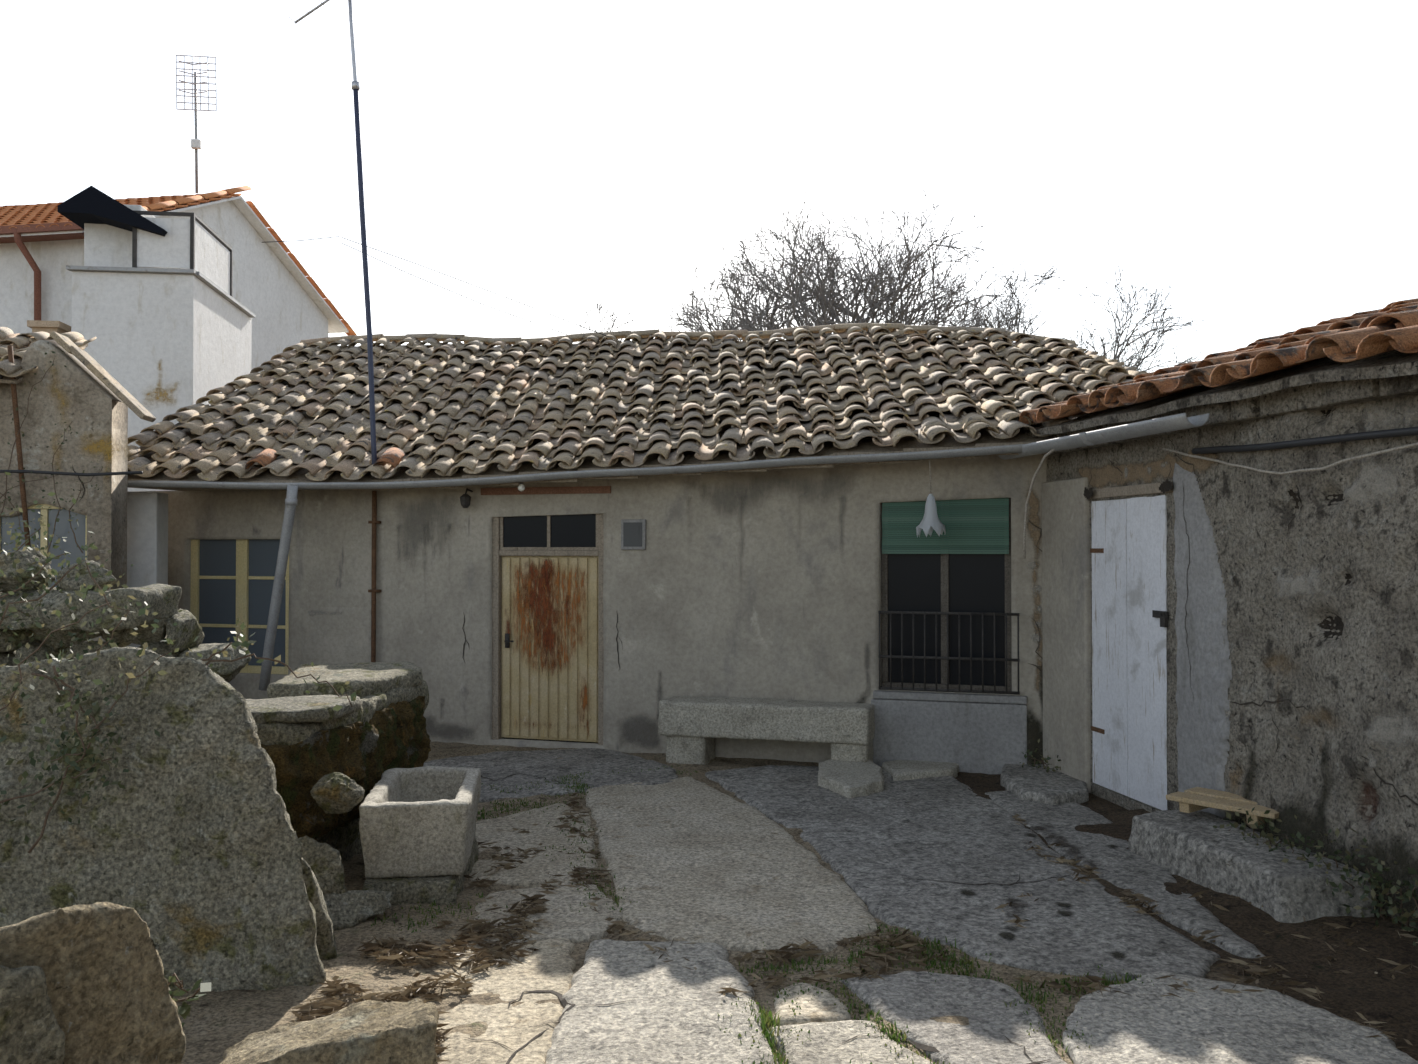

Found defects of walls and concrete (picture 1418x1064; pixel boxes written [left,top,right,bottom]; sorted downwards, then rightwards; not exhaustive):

corrosion [506,559,585,670]
crack [1358,750,1418,806]